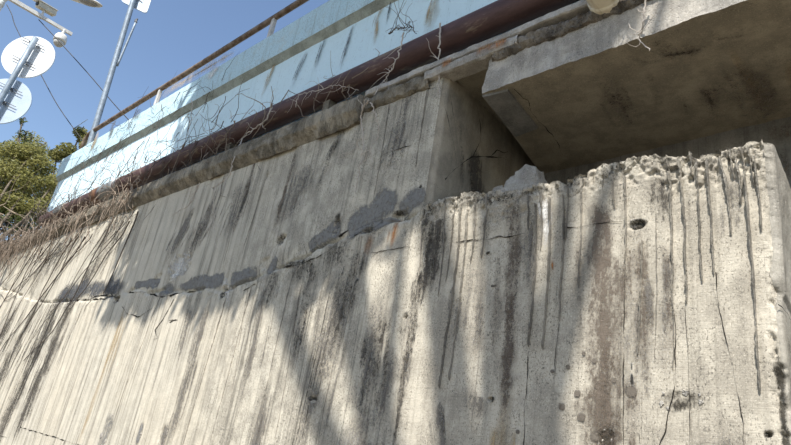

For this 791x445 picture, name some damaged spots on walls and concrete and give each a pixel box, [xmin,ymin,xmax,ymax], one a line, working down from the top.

rust [424,35,520,83]
crack [284,230,360,268]
spalling [630,219,647,230]
water stain [0,213,134,441]
water stain [352,143,753,445]
crack [623,359,640,445]
crack [659,312,691,445]